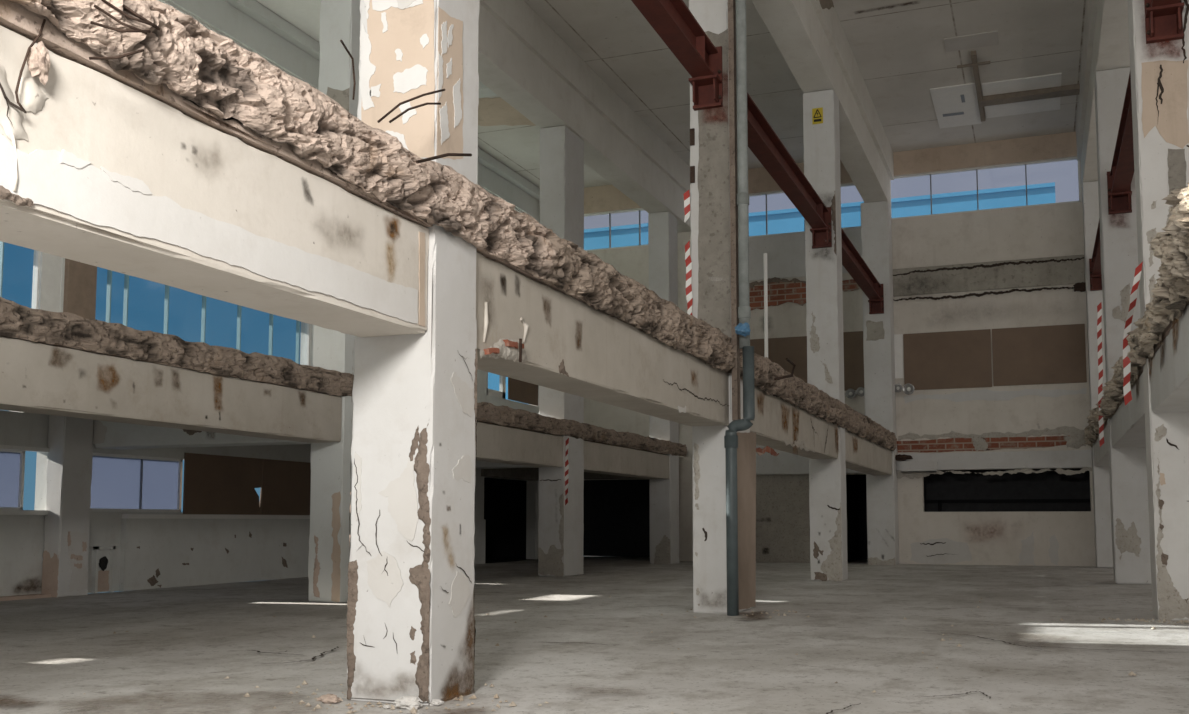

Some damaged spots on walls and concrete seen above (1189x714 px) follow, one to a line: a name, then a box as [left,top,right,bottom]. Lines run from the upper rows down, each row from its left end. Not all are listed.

crack [1155,0,1189,124]
spalling [0,0,1189,453]
crack [893,257,1084,301]
spalling [450,338,700,510]
crack [663,379,726,406]
spalling [147,568,162,588]
peeling [313,425,431,703]
crack [354,459,424,575]
spalling [1115,518,1141,560]
peeling [1156,426,1189,620]